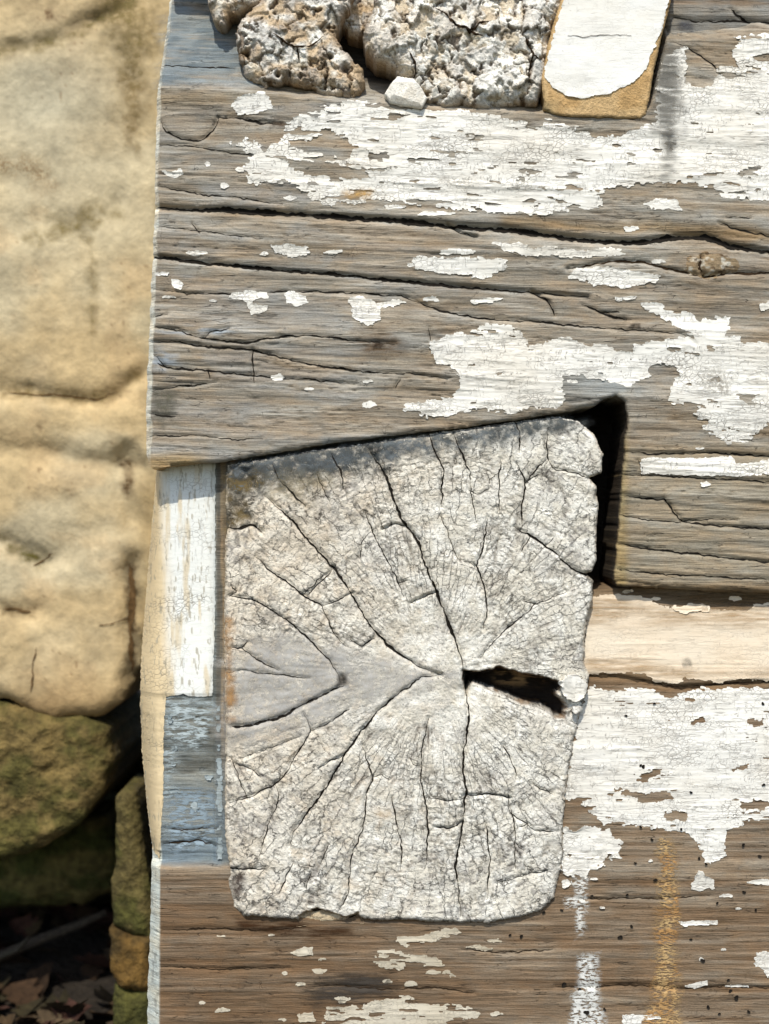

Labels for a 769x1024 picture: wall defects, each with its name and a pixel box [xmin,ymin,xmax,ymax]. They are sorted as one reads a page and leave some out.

spalling [384,76,427,109]
peeling [544,0,669,99]